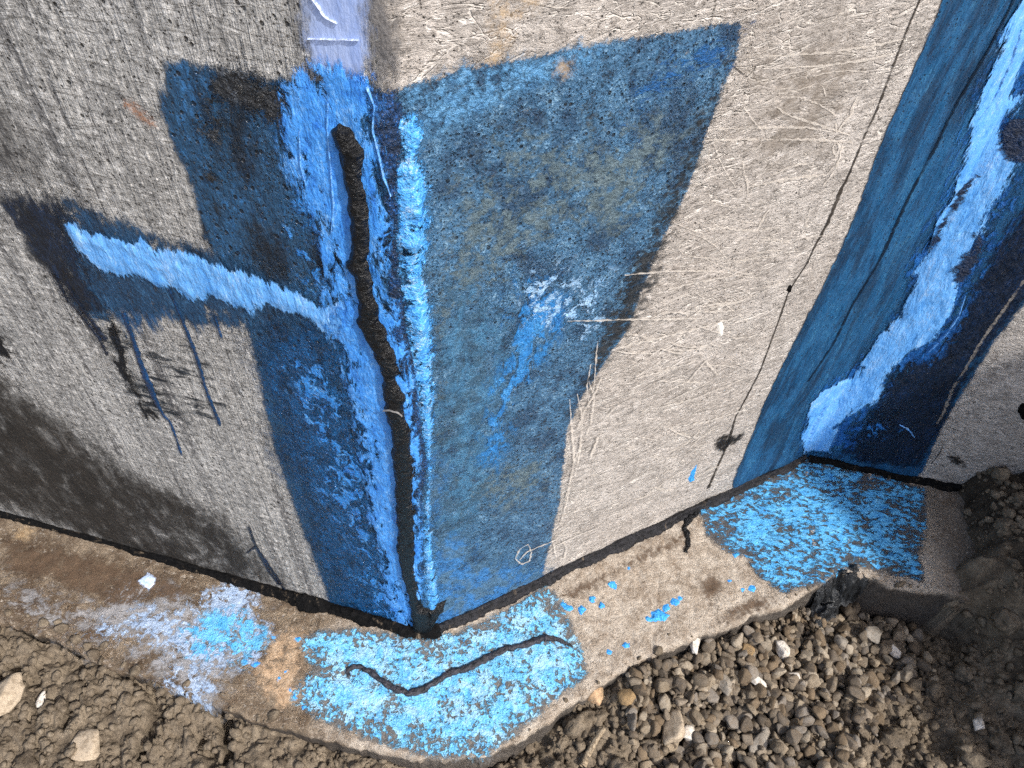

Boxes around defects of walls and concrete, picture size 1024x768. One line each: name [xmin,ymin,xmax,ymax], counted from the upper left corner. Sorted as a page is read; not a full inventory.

crack [707,0,921,489]
crack [808,0,1015,382]
crack [345,634,573,697]